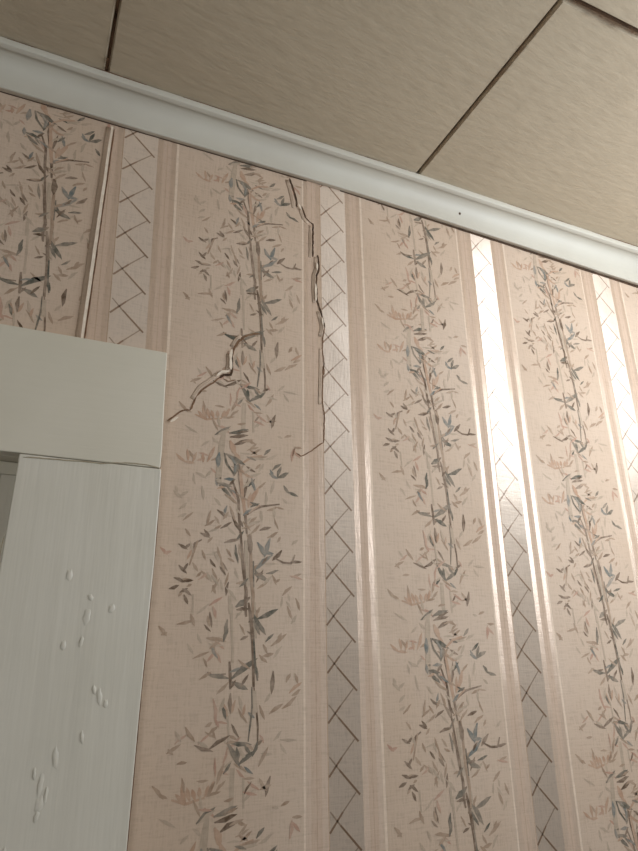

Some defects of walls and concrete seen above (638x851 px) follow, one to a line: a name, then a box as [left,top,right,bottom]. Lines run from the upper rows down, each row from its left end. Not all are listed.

crack [87,65,146,85]
crack [0,91,325,456]
crack [341,191,638,288]
crack [25,457,161,849]